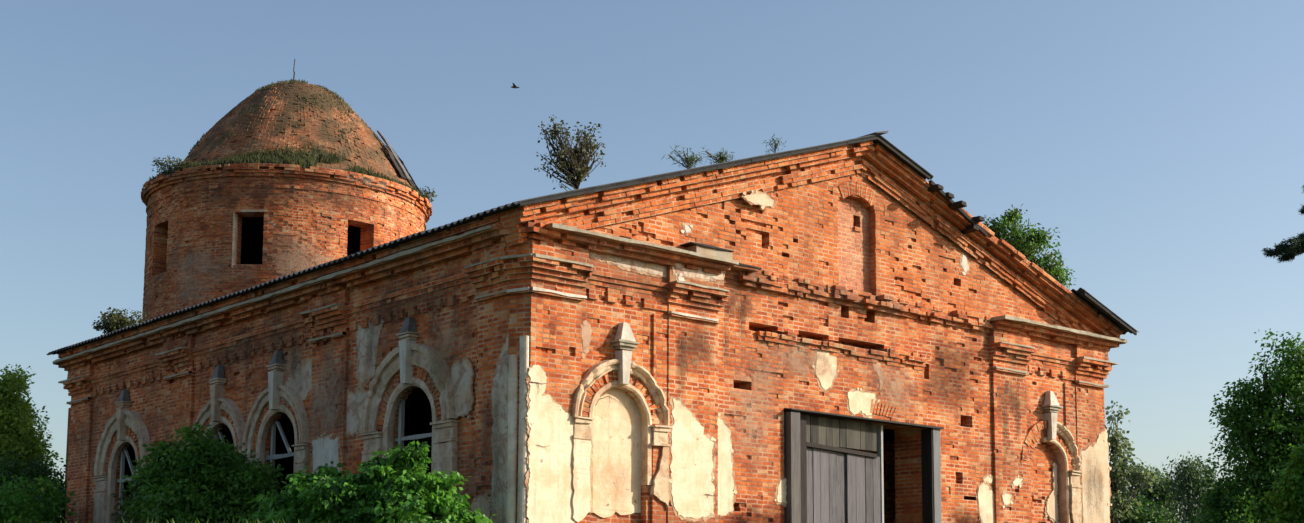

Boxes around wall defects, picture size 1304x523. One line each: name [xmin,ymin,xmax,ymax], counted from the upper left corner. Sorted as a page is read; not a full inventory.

spalling [611,190,798,258]